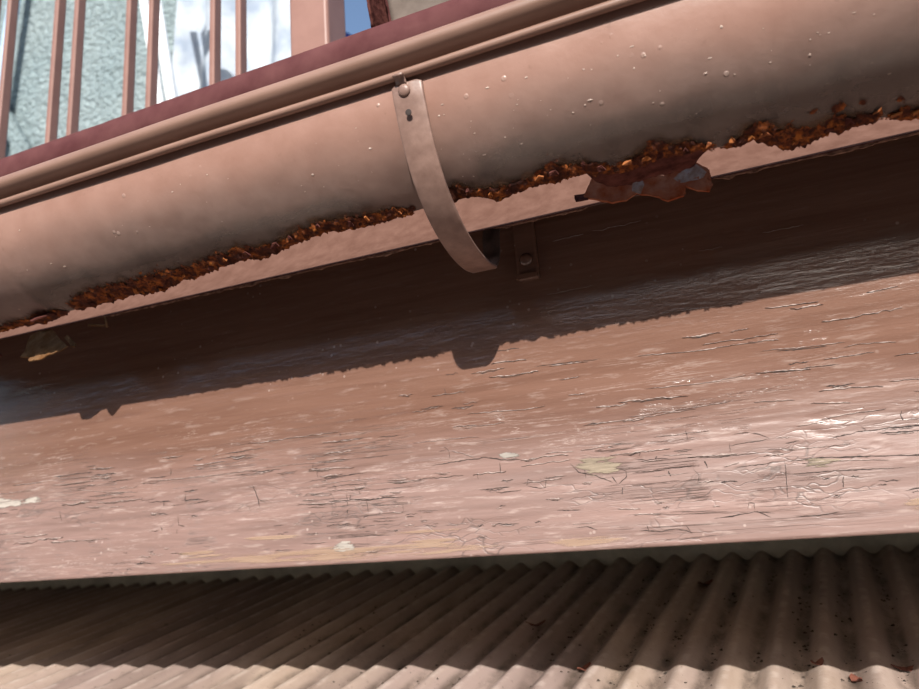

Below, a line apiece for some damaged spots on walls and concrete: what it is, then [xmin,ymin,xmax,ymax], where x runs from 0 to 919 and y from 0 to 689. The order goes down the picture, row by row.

peeling [574,150,713,204]
rust [448,94,919,203]
rust [0,206,416,332]
crack [0,239,919,574]